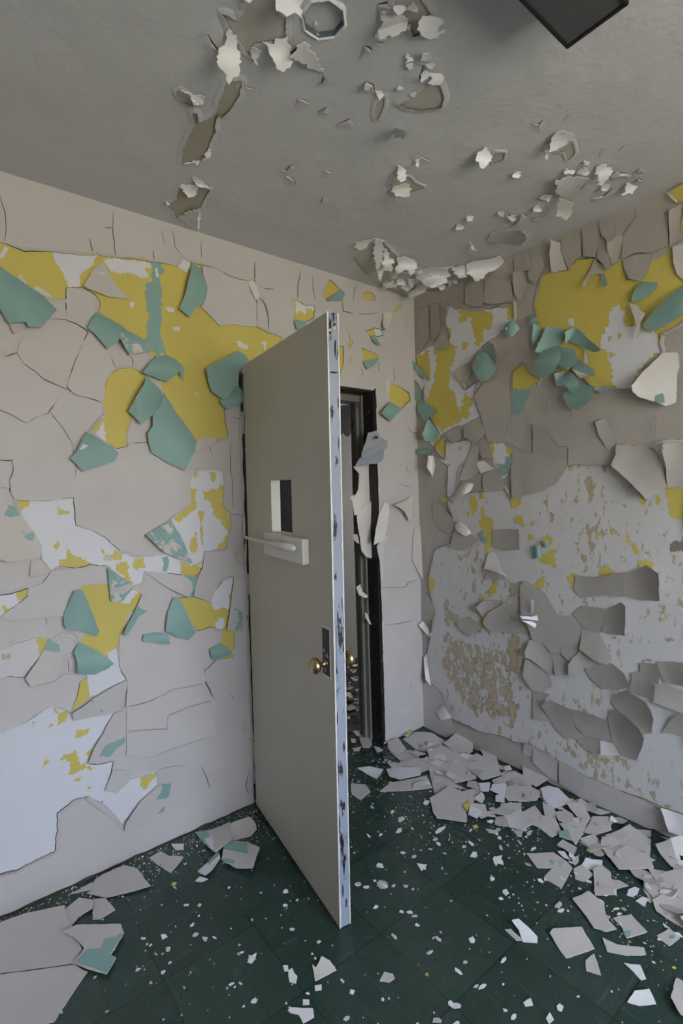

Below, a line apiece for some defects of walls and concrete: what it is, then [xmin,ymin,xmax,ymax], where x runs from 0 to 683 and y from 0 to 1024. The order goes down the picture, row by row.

peeling [0,239,285,878]